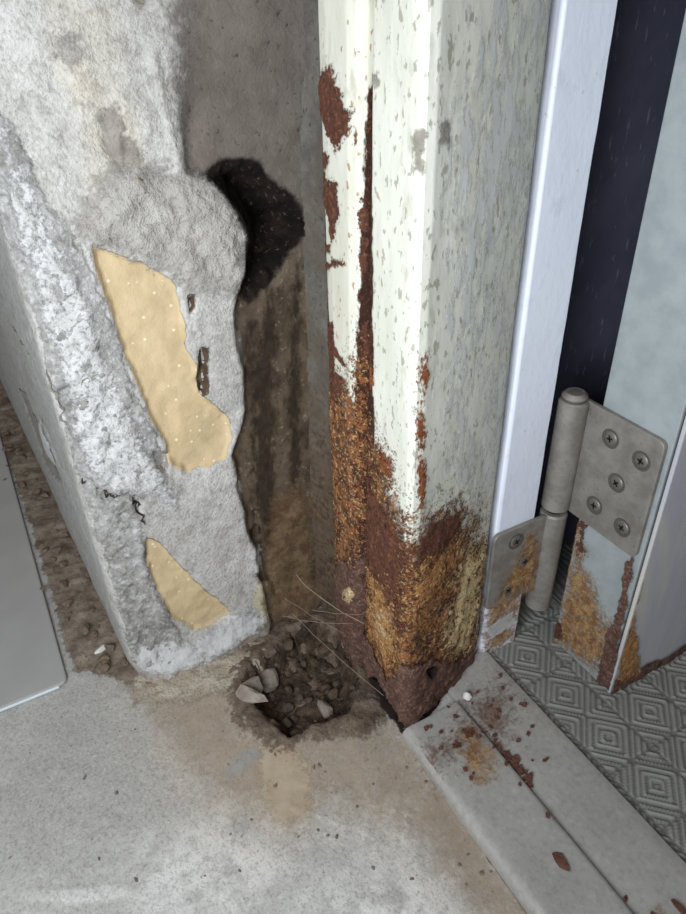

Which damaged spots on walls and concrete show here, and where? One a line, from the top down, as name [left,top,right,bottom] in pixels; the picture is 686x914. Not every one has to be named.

spalling [95,103,141,172]
water stain [173,0,305,218]
spalling [206,158,305,303]
spalling [0,115,232,669]
water stain [232,237,323,610]
rust [318,64,549,788]
rust [553,520,686,695]
rust [552,852,569,872]
rust [671,899,686,914]